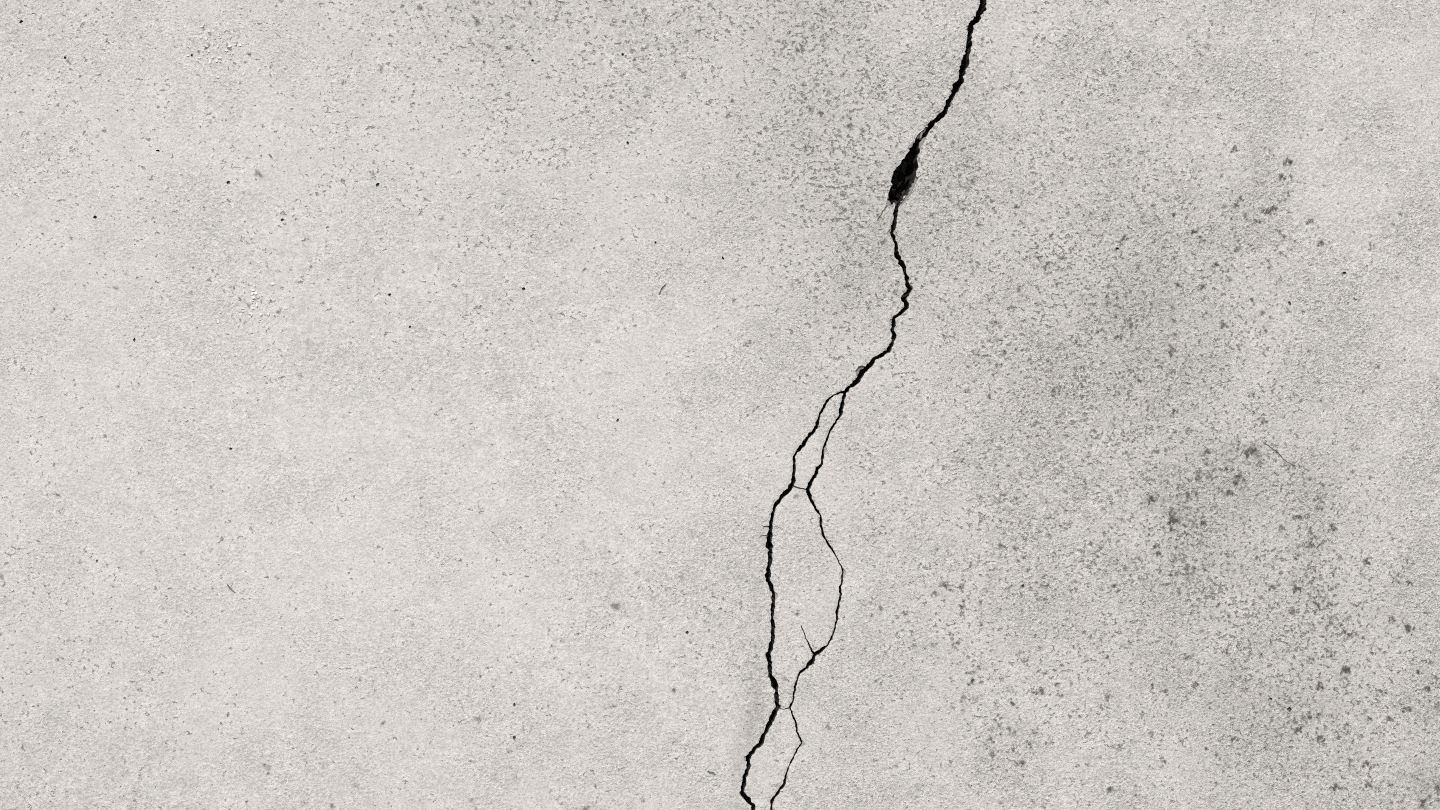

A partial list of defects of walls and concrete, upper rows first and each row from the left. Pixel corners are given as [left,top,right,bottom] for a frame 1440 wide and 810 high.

crack [909,0,987,151]
crack [739,206,914,810]